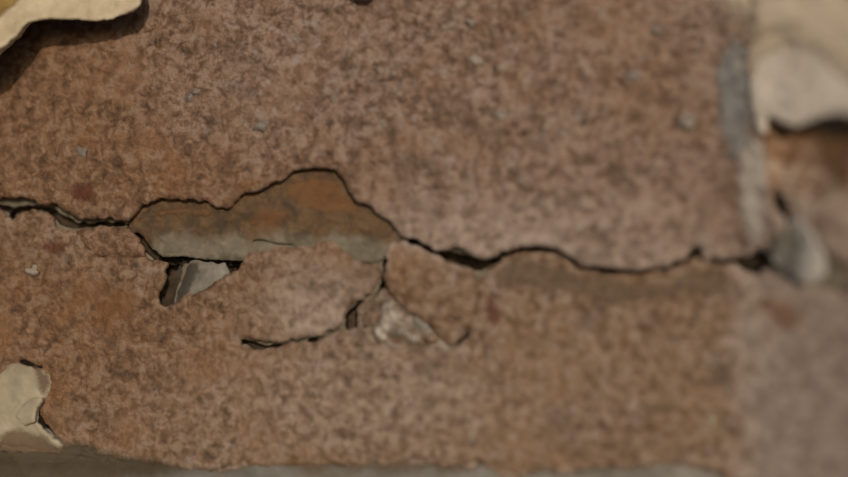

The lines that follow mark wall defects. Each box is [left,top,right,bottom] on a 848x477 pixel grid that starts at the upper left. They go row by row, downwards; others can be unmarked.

peeling [0,0,142,55]
peeling [747,0,848,285]
crack [0,205,243,307]
spalling [127,168,410,303]
crack [408,238,780,275]
crack [774,194,793,226]
crack [242,339,283,350]
crack [345,259,388,330]
spalling [357,288,458,352]
peeling [0,363,64,458]